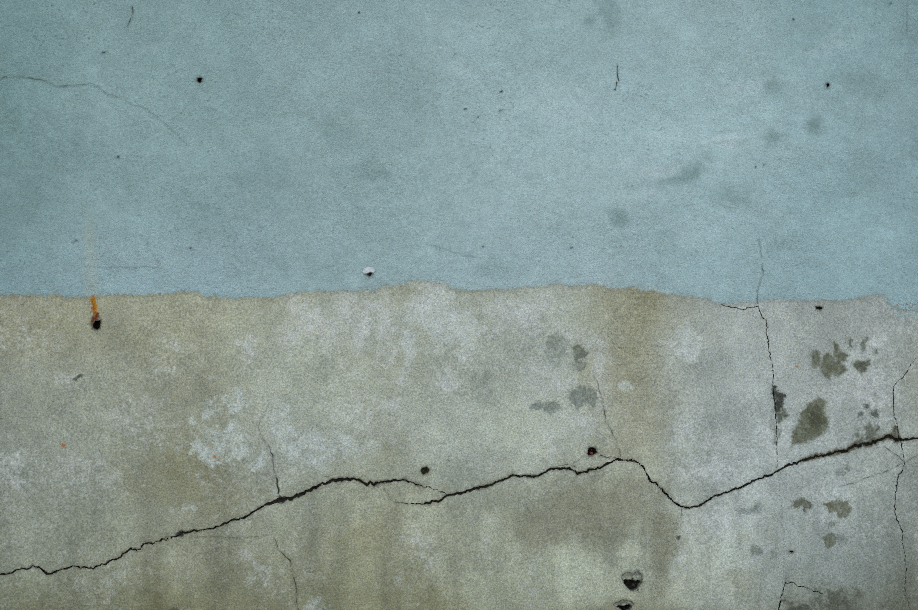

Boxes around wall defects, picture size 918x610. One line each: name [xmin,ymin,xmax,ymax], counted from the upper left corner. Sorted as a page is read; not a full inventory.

crack [0,75,188,146]
crack [0,239,918,610]
flaking render [0,280,918,610]
damp [509,281,708,610]
damp [767,403,791,451]
mould [849,419,887,445]